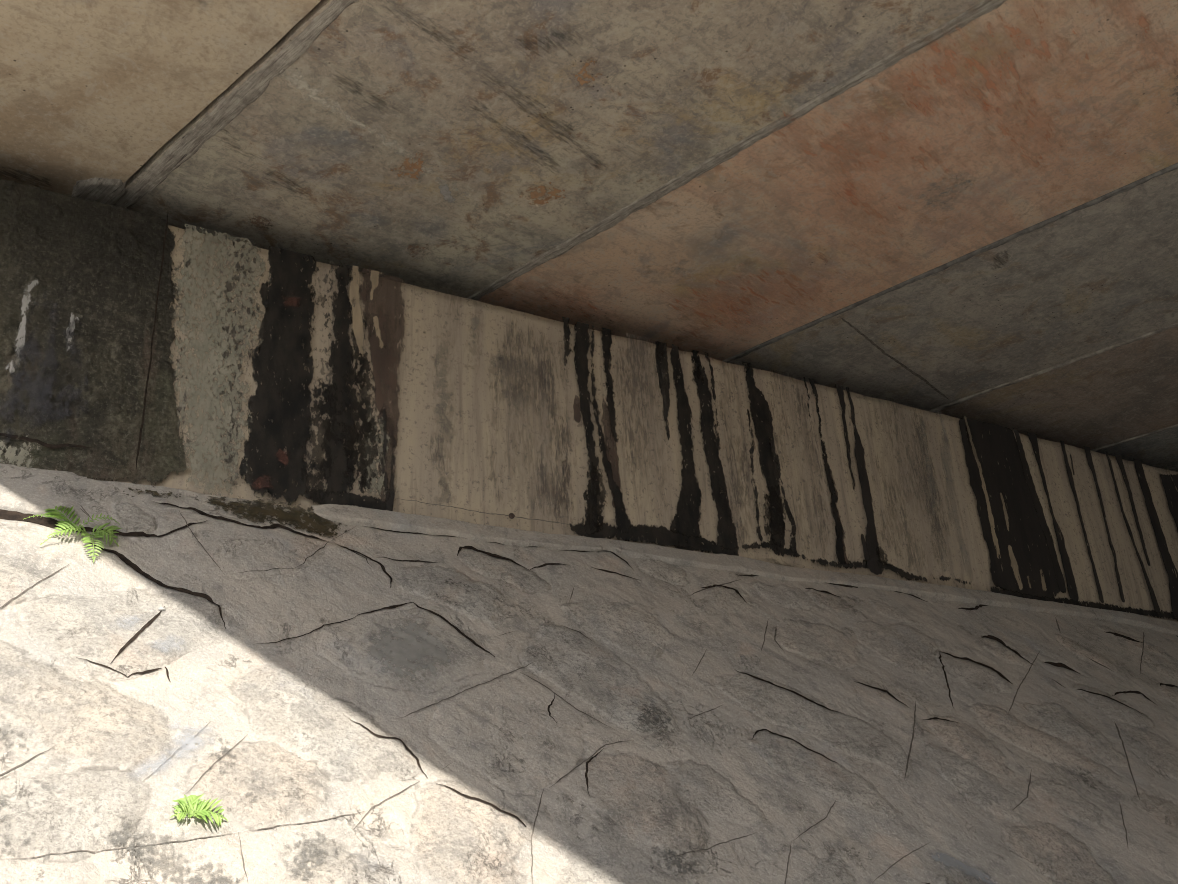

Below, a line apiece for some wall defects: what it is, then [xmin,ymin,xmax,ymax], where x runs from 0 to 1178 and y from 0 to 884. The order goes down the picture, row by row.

water stain [0,292,88,436]
water stain [169,224,405,511]
crack [688,574,758,602]
water stain [495,317,971,585]
crack [805,583,858,597]
water stain [959,418,1178,620]
crack [0,498,638,884]
crack [736,621,844,714]
crack [752,729,842,766]
crack [854,604,1178,845]
crack [658,833,754,861]
crack [784,800,836,884]